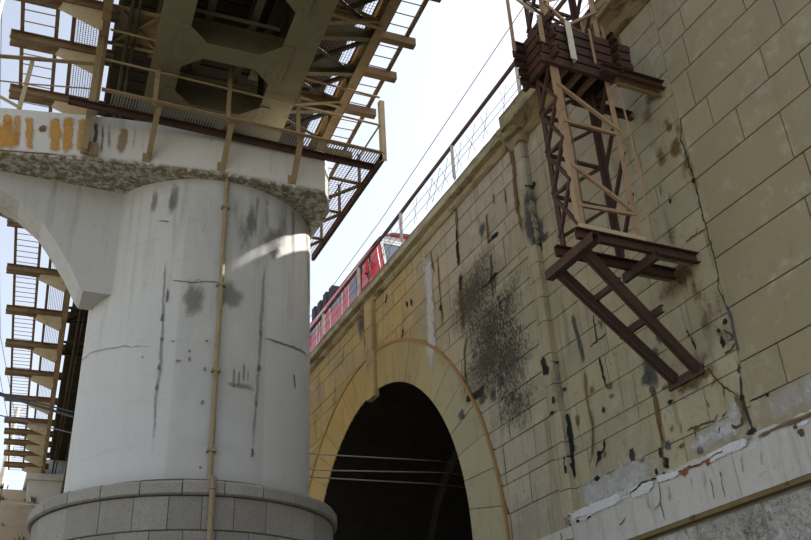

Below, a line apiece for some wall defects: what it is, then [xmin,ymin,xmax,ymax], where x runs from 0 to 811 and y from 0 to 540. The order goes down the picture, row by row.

crack [81,345,140,362]
damp [267,233,280,255]
damp [451,249,559,430]
crack [680,118,769,454]
peeling [563,401,747,525]